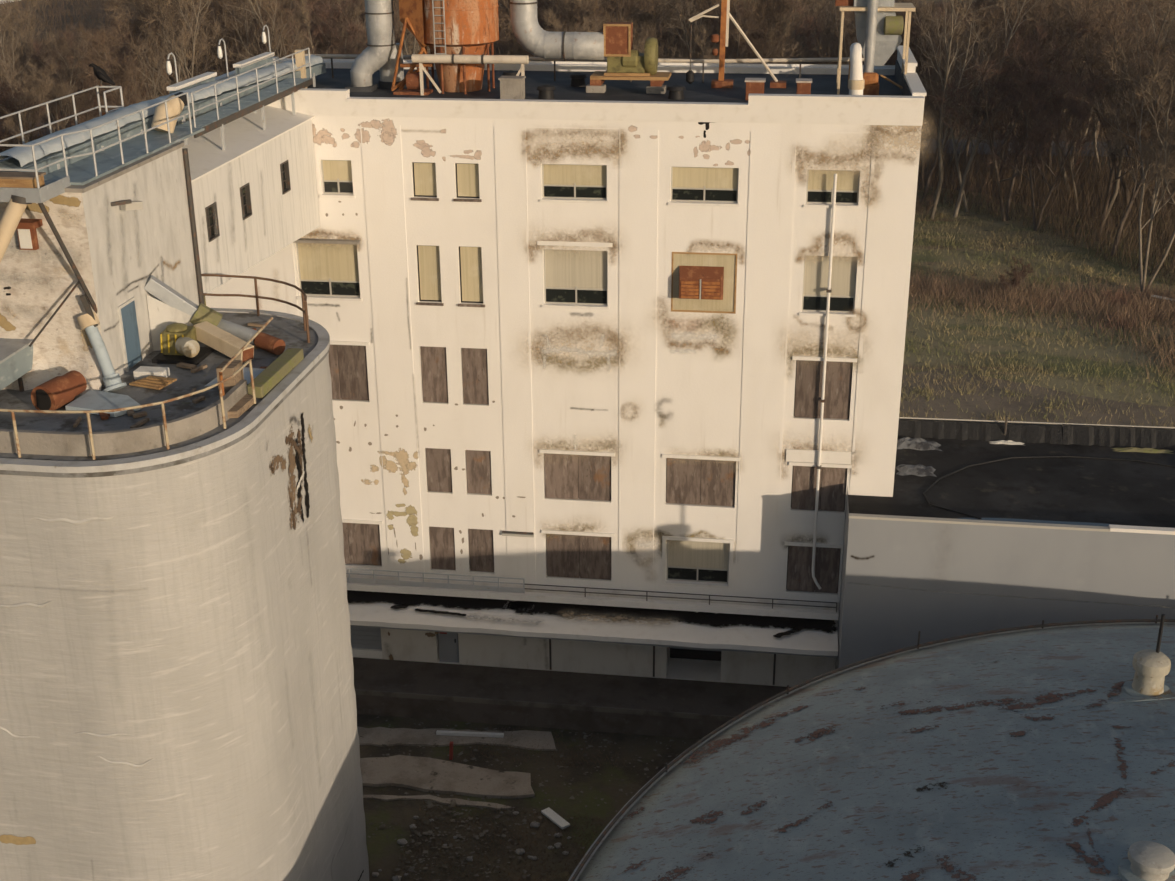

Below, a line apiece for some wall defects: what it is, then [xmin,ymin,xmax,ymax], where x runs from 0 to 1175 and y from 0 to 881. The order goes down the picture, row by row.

peeling [312,119,397,148]
water stain [529,135,624,160]
peeling [679,136,751,166]
water stain [670,317,730,354]
spalling [269,412,313,530]
peeling [361,442,423,563]
corrosion [683,705,808,764]
corrosion [881,681,1125,737]
corrosion [1066,726,1131,876]
corrosion [886,846,925,881]